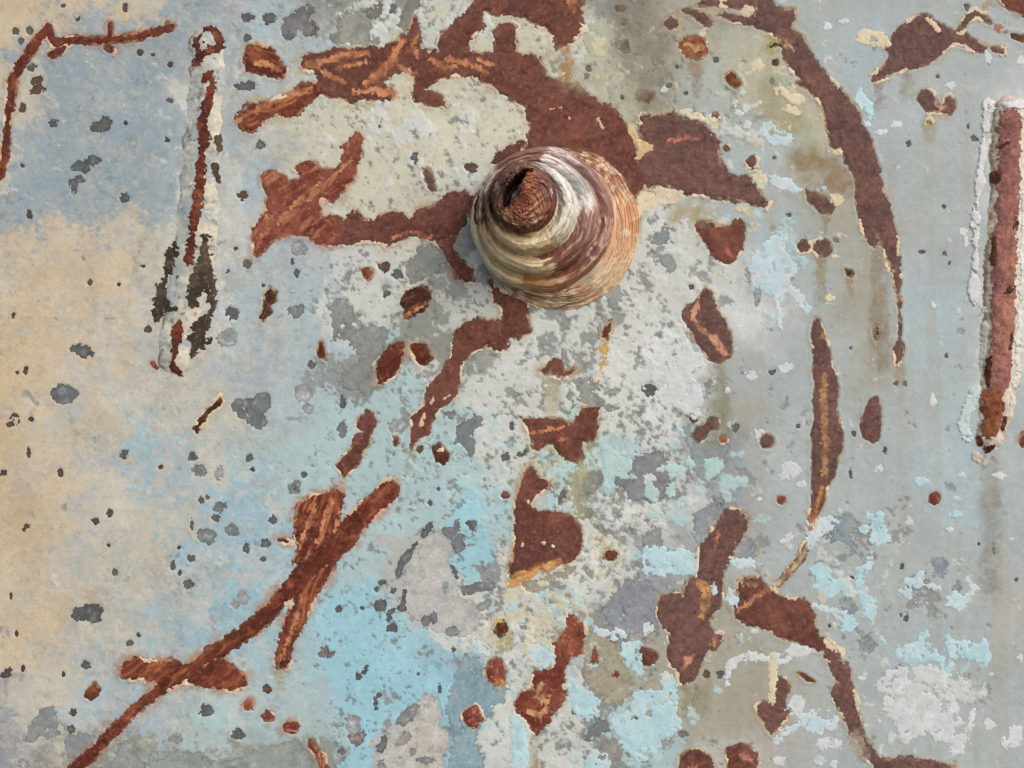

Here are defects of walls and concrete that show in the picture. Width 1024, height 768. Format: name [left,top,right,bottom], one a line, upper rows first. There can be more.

rust [144,25,226,377]
peeling [241,0,421,46]
rust [234,0,773,265]
rust [663,0,905,382]
peeling [70,603,104,623]
peeling [190,494,271,562]
rust [67,408,401,768]
peeling [337,518,530,768]
rust [501,357,601,588]
peeling [561,342,731,768]
rust [639,316,958,768]
peeling [703,511,1023,768]